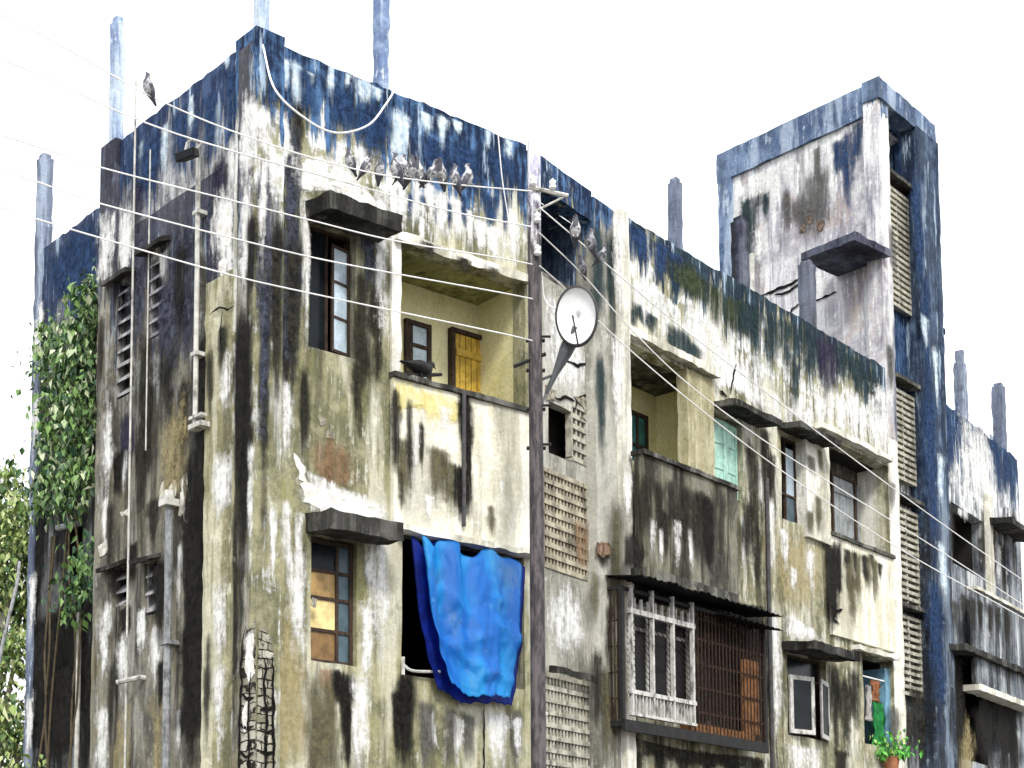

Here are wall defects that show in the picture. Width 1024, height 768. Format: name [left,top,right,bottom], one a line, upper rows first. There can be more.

damp [47,52,522,768]
rust [315,441,349,485]
flaking render [293,452,384,518]
damp [593,216,893,446]
damp [734,123,865,260]
crack [762,279,837,312]
damp [890,177,1023,768]
damp [26,502,165,768]
flaking render [239,619,276,768]
damp [547,470,715,754]